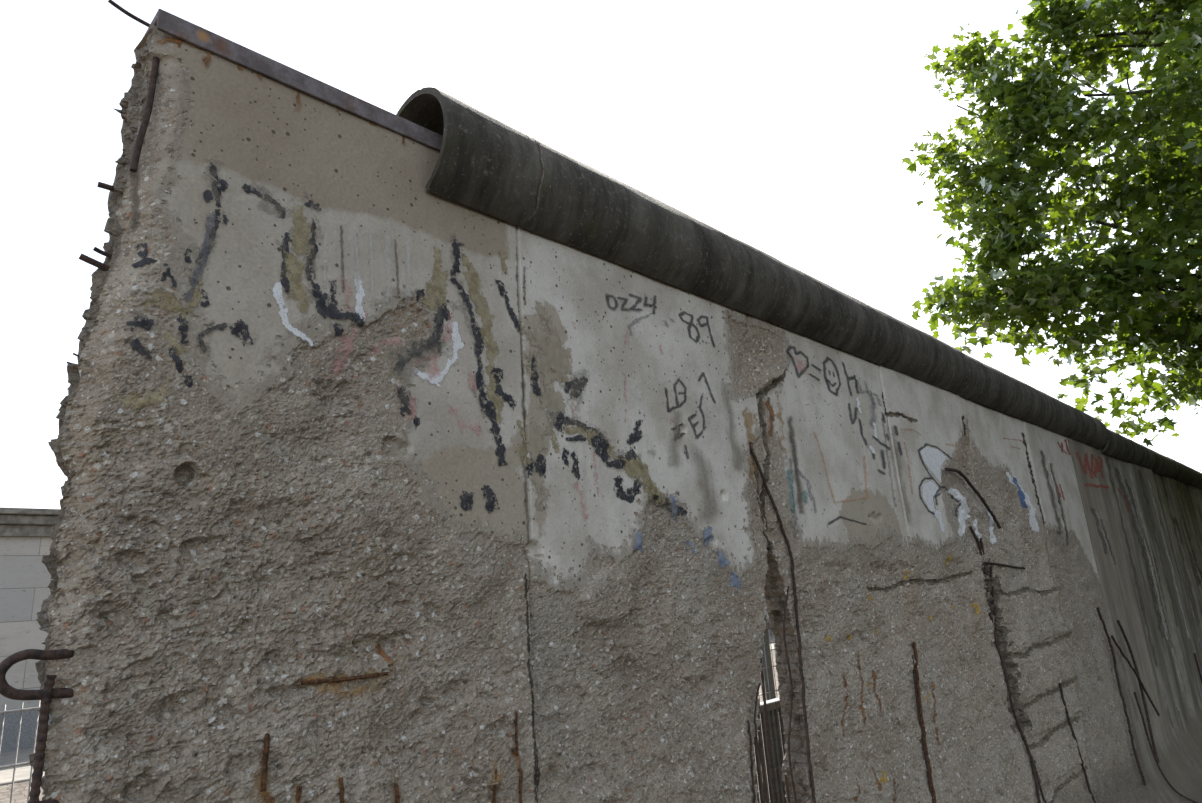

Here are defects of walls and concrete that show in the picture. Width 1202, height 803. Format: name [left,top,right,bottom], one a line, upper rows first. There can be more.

spalling [108,0,150,27]
spalling [0,25,813,803]
crack [749,366,787,524]
crack [524,574,541,803]
spalling [742,398,1103,803]
spalling [1096,607,1199,803]